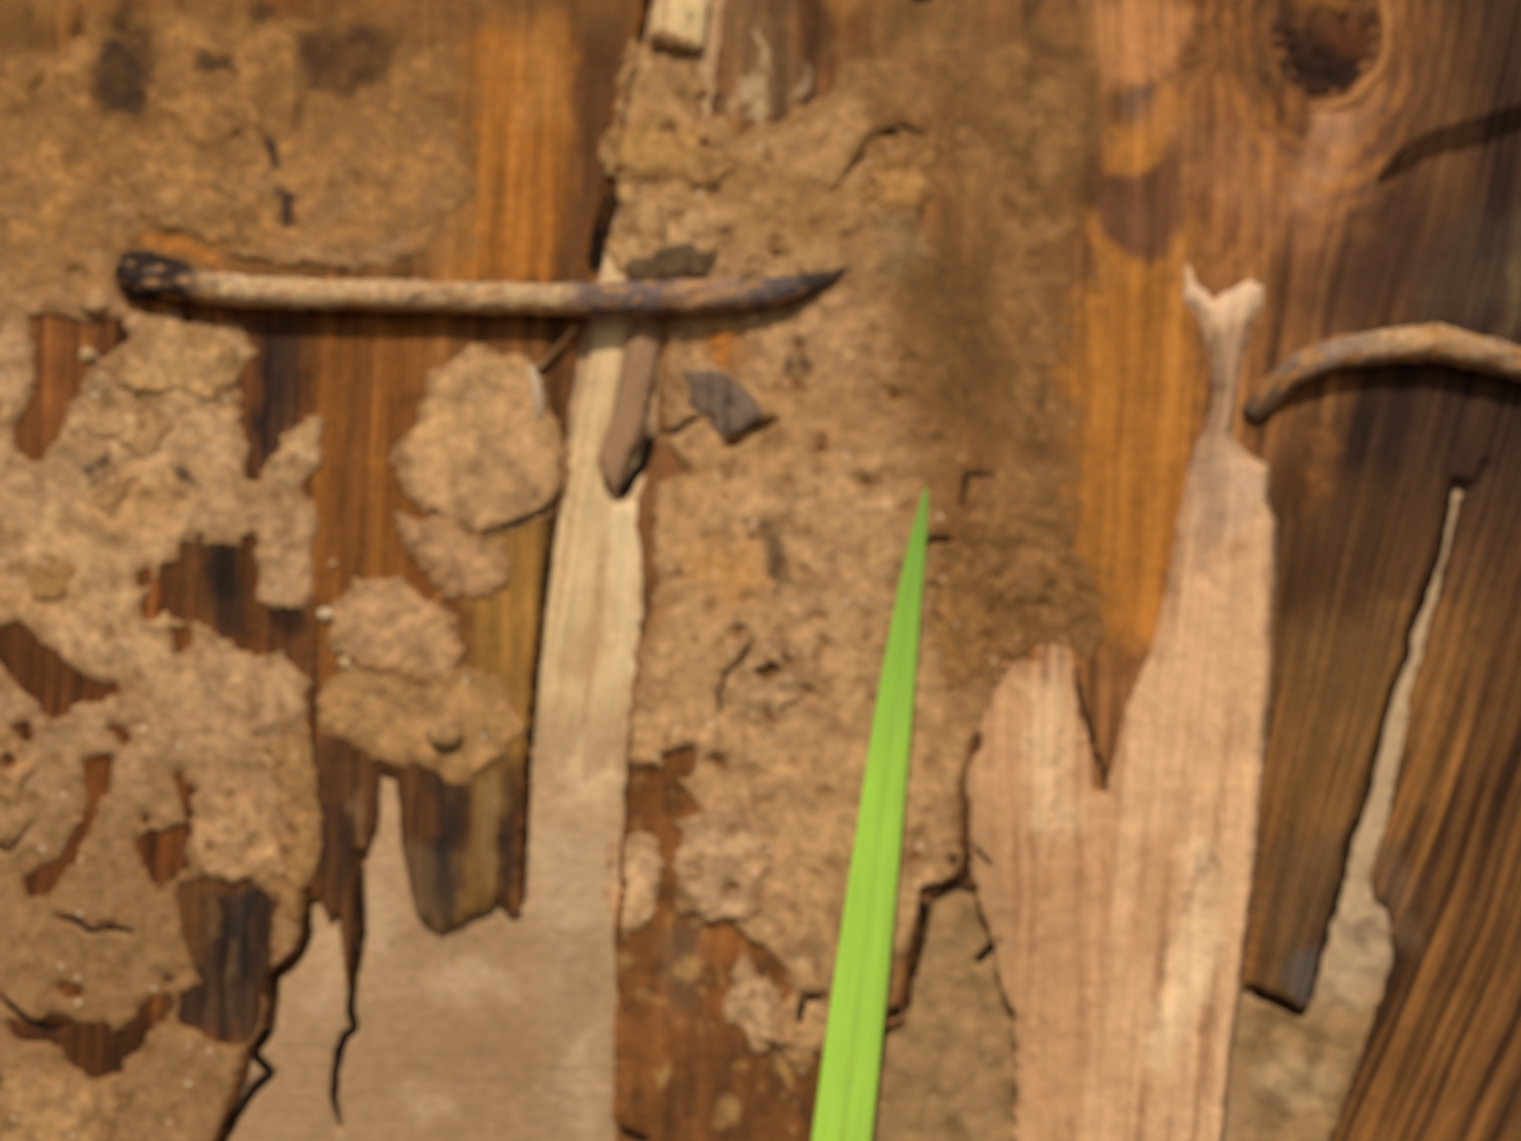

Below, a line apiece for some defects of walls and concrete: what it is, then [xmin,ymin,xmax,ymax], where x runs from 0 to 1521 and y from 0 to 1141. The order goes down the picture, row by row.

crack [641,0,652,45]
crack [587,188,619,273]
peeling [603,109,741,259]
peeling [860,131,939,214]
peeling [79,317,240,459]
peeling [719,644,810,732]
peeling [0,727,37,808]
crack [1249,464,1486,1016]
peeling [190,778,287,886]
peeling [672,800,776,924]
peeling [722,953,785,1054]
peeling [0,1058,131,1141]